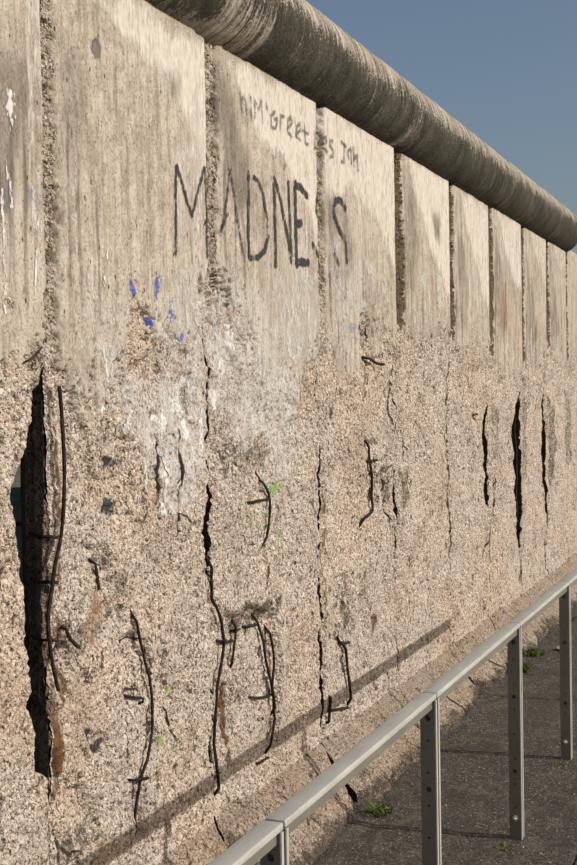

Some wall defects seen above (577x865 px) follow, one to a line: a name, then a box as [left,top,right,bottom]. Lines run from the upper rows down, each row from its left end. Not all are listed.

corrosion [48,439,71,647]
crack [154,429,192,532]
spalling [0,0,398,865]
spalling [390,152,577,684]
corrosion [50,665,67,799]
corrosion [211,655,241,761]